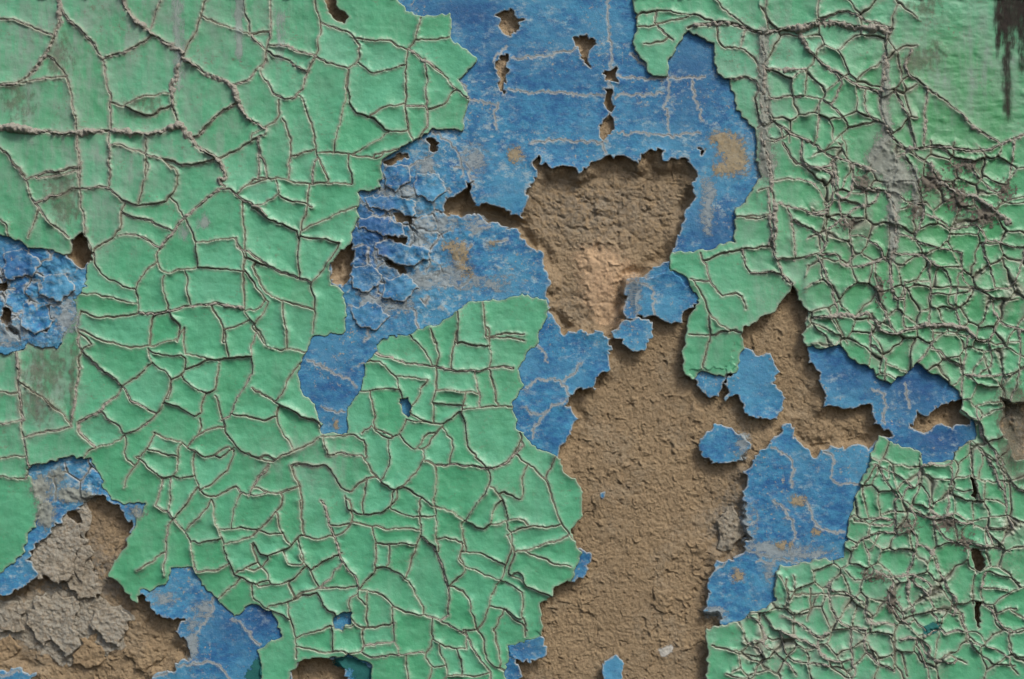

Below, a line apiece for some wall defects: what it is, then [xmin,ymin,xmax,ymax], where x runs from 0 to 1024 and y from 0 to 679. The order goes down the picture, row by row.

peeling [0,0,398,573]
crack [0,0,572,679]
peeling [0,437,583,679]
peeling [173,0,1024,497]
spalling [504,135,1024,679]
crack [518,0,1024,678]
damp [995,0,1024,119]